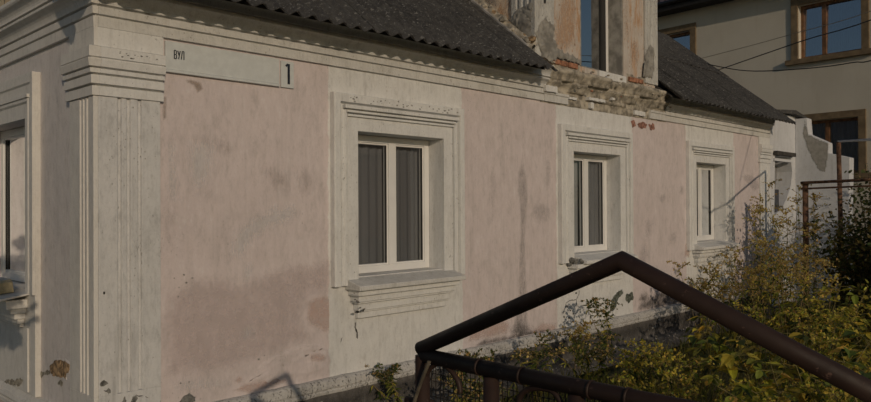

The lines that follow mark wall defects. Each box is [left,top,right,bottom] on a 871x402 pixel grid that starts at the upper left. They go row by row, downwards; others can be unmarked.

spalling [540,35,672,131]
peeling [609,289,634,312]
spalling [40,358,70,386]
spalling [177,381,197,402]